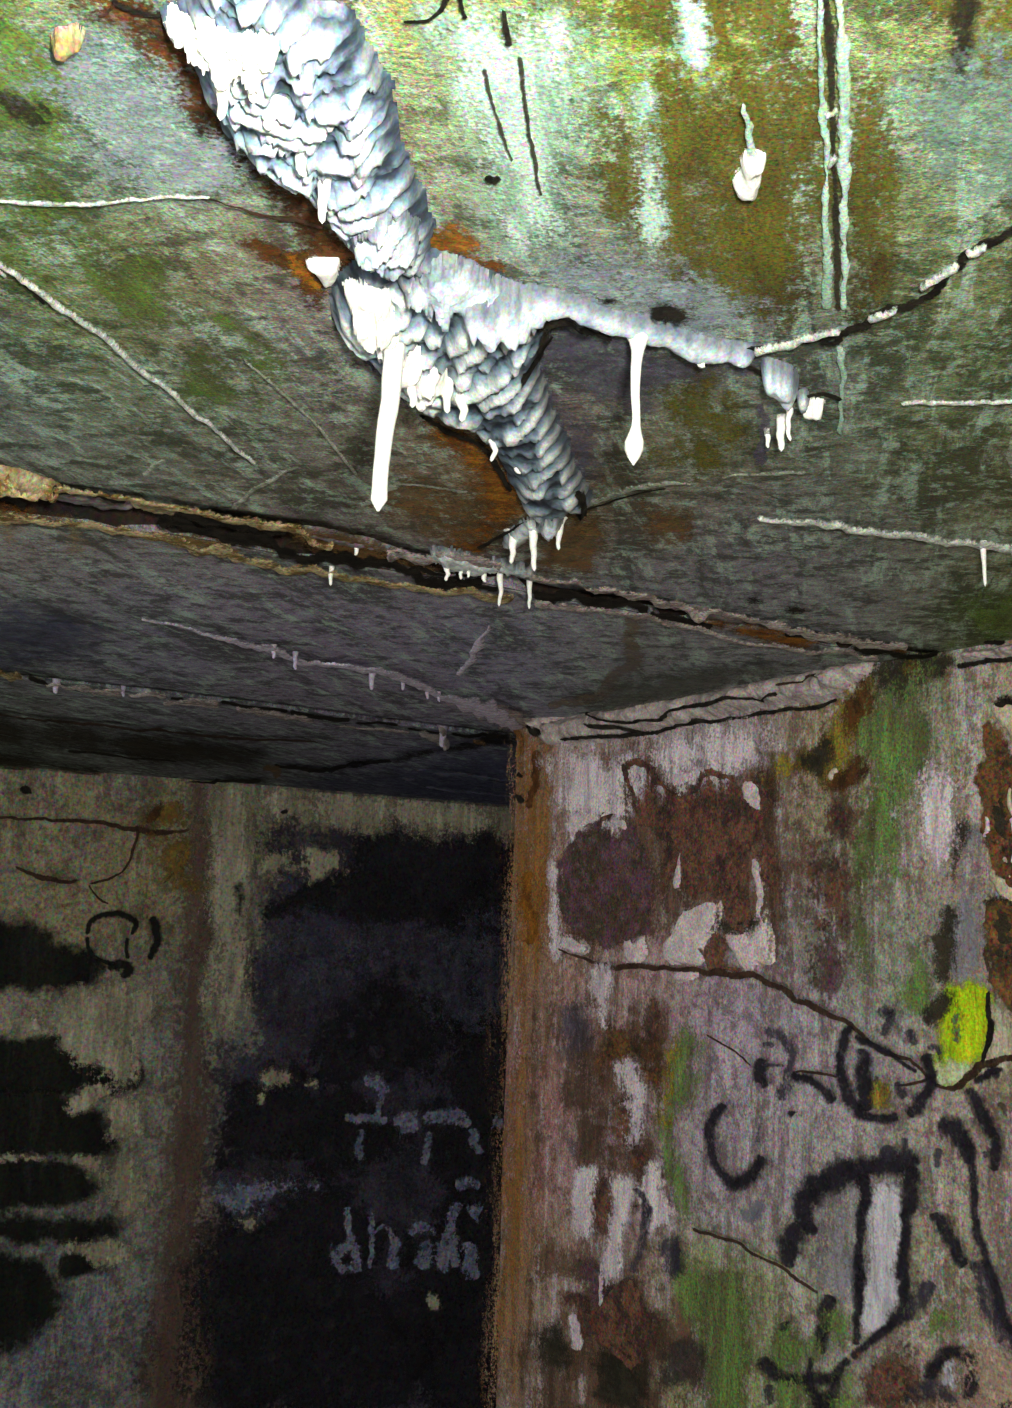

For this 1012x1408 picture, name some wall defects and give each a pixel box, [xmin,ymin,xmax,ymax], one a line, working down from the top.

crack [0,194,324,230]
corrosion [69,0,355,311]
corrosion [430,221,506,272]
crack [482,10,542,195]
damp [413,0,764,336]
damp [541,319,763,486]
crack [747,226,1012,465]
crack [560,673,837,741]
damp [0,717,269,1408]
damp [416,906,512,1033]
corrosion [485,727,560,1408]
crack [558,948,1012,1092]